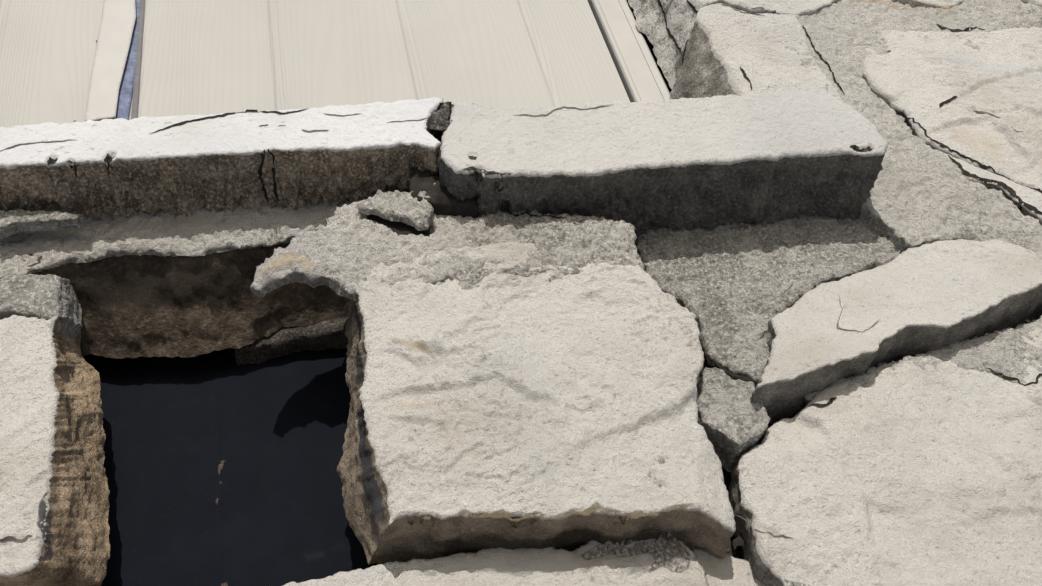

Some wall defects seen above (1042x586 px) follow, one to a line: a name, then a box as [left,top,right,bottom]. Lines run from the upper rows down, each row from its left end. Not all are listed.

crack [937,24,984,32]
crack [657,0,844,96]
crack [513,105,609,116]
crack [939,96,1023,132]
crack [0,139,72,151]
crack [150,108,361,202]
crack [906,117,1042,214]
water stain [354,303,363,384]
crack [714,360,755,381]
crack [987,368,1042,386]
crack [807,397,837,407]
water stain [357,408,385,522]